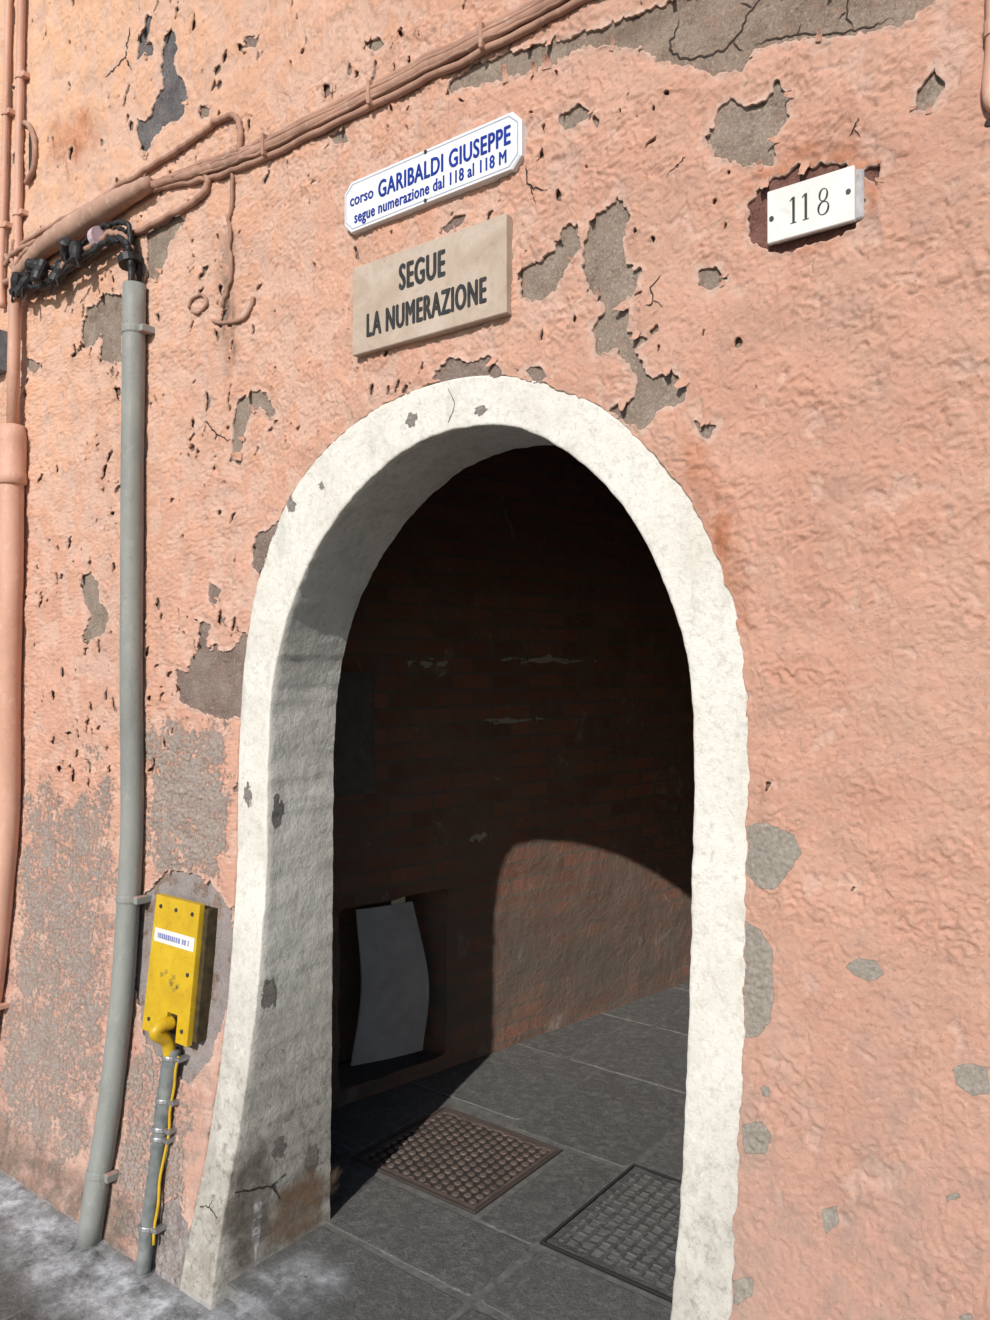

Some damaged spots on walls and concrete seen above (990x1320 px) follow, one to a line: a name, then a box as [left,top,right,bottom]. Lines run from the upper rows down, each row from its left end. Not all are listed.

peeling [132,15,211,161]
spalling [444,0,935,102]
peeling [706,81,884,254]
peeling [78,292,123,371]
peeling [516,198,690,430]
peeling [228,387,278,465]
peeling [144,583,248,885]
peeling [746,823,802,890]
peeling [743,921,774,1038]